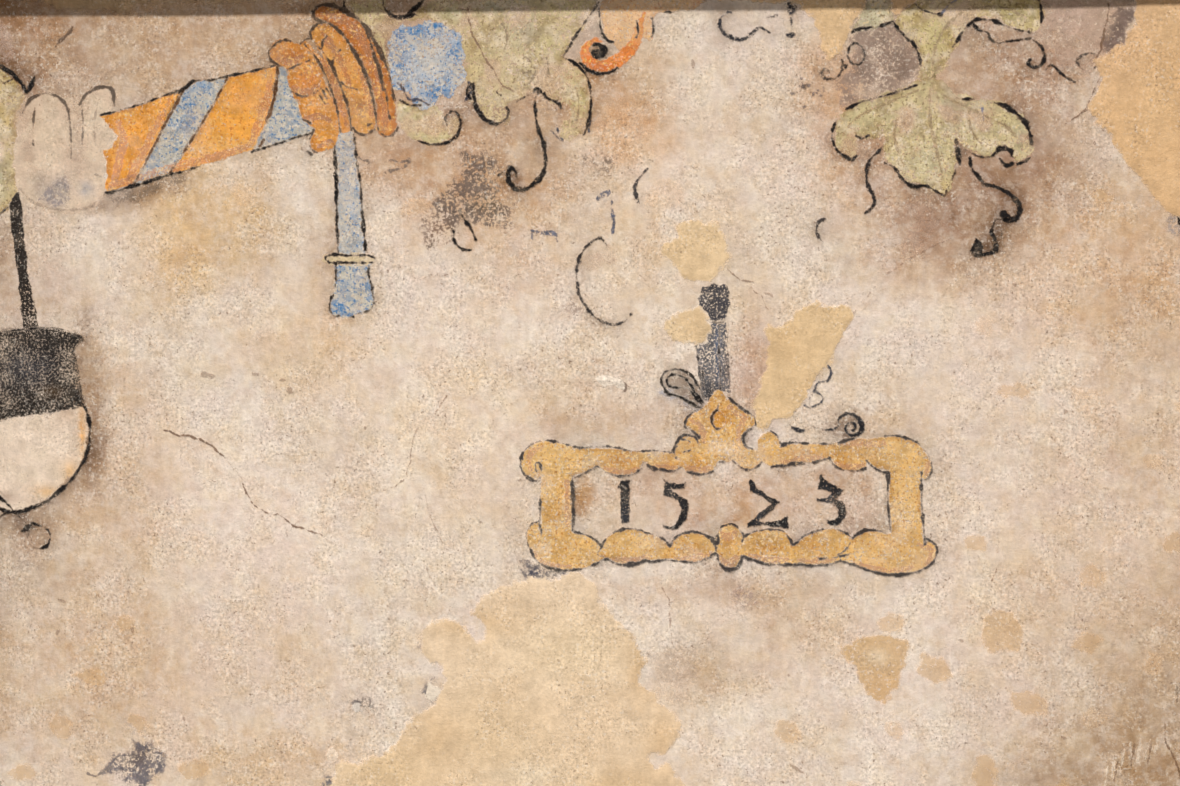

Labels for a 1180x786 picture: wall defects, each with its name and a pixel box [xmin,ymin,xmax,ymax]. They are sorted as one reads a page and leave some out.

crack [164,430,224,456]
crack [242,483,322,535]
spalling [842,635,909,703]